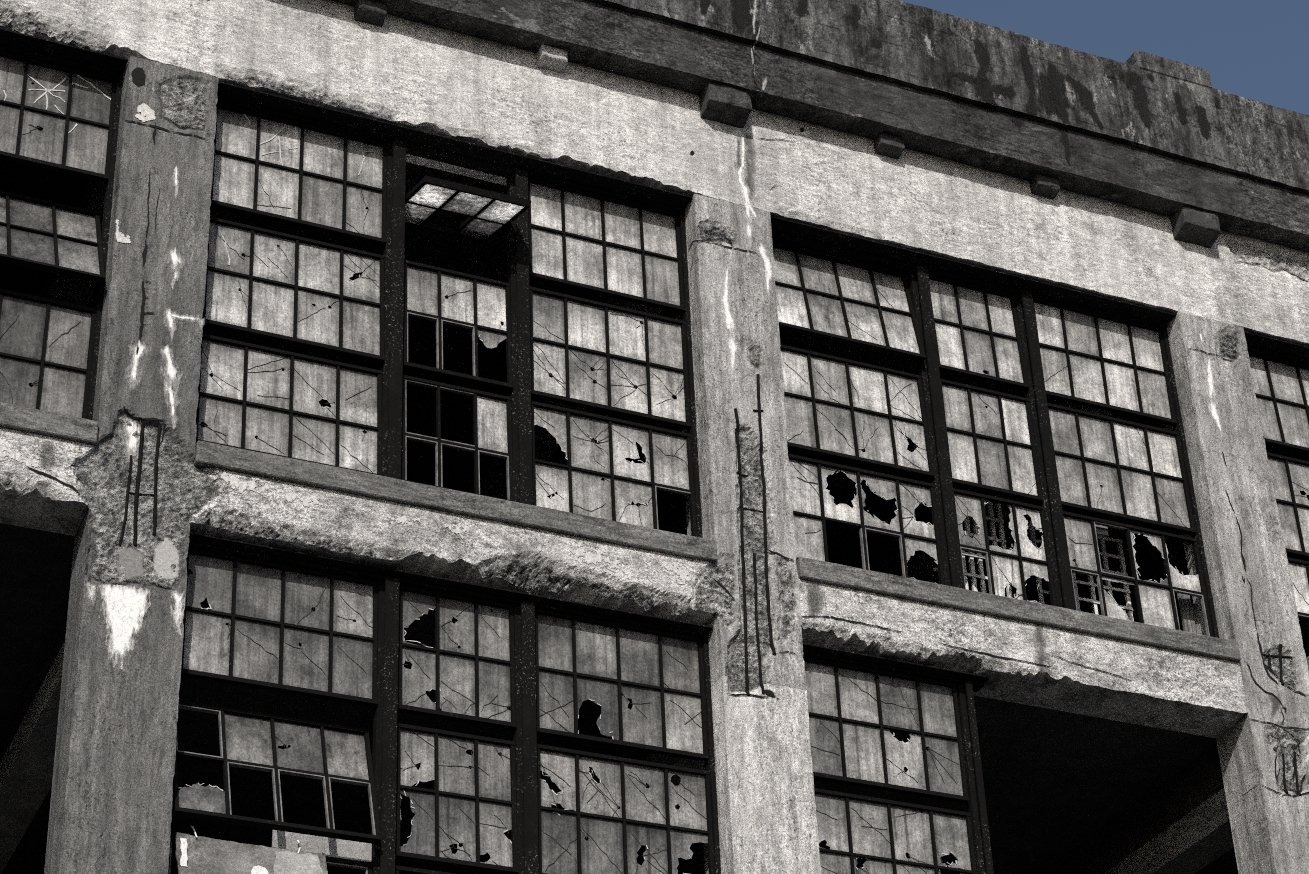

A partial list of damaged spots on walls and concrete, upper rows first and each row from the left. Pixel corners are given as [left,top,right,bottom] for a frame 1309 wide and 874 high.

crack [751,23,759,85]
damp [950,38,1103,163]
damp [1126,71,1155,128]
damp [1174,92,1220,139]
spalling [0,416,407,589]
peeling [383,515,421,529]
peeling [442,522,477,540]
spalling [481,351,796,696]
spalling [1263,644,1297,689]
spalling [1278,742,1303,796]